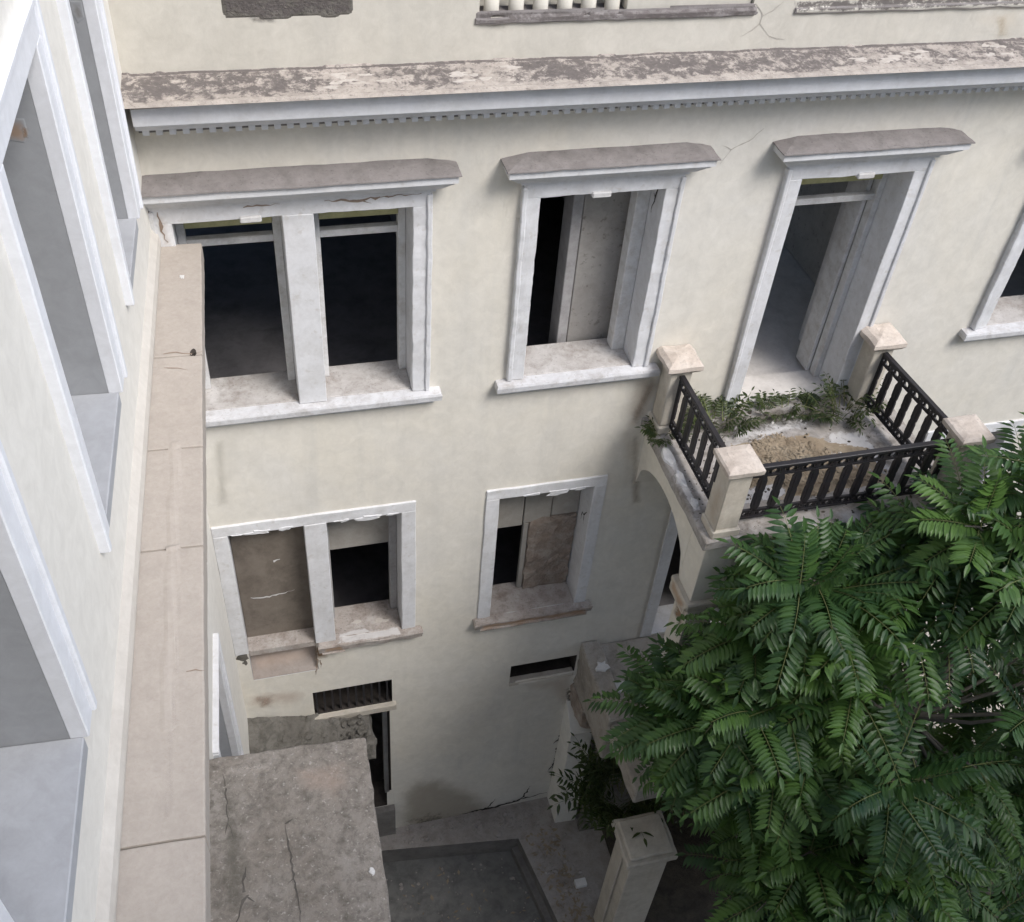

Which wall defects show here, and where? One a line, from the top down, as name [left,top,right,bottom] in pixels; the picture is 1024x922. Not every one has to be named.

crack [740,2,784,40]
peeling [849,49,929,63]
peeling [982,43,1014,57]
peeling [323,72,395,89]
peeling [449,71,492,83]
peeling [325,193,421,203]
flaking render [523,486,589,497]
flaking render [333,512,399,523]
crack [465,735,560,814]
crack [222,773,233,836]
crack [285,819,301,922]
crack [236,867,255,922]